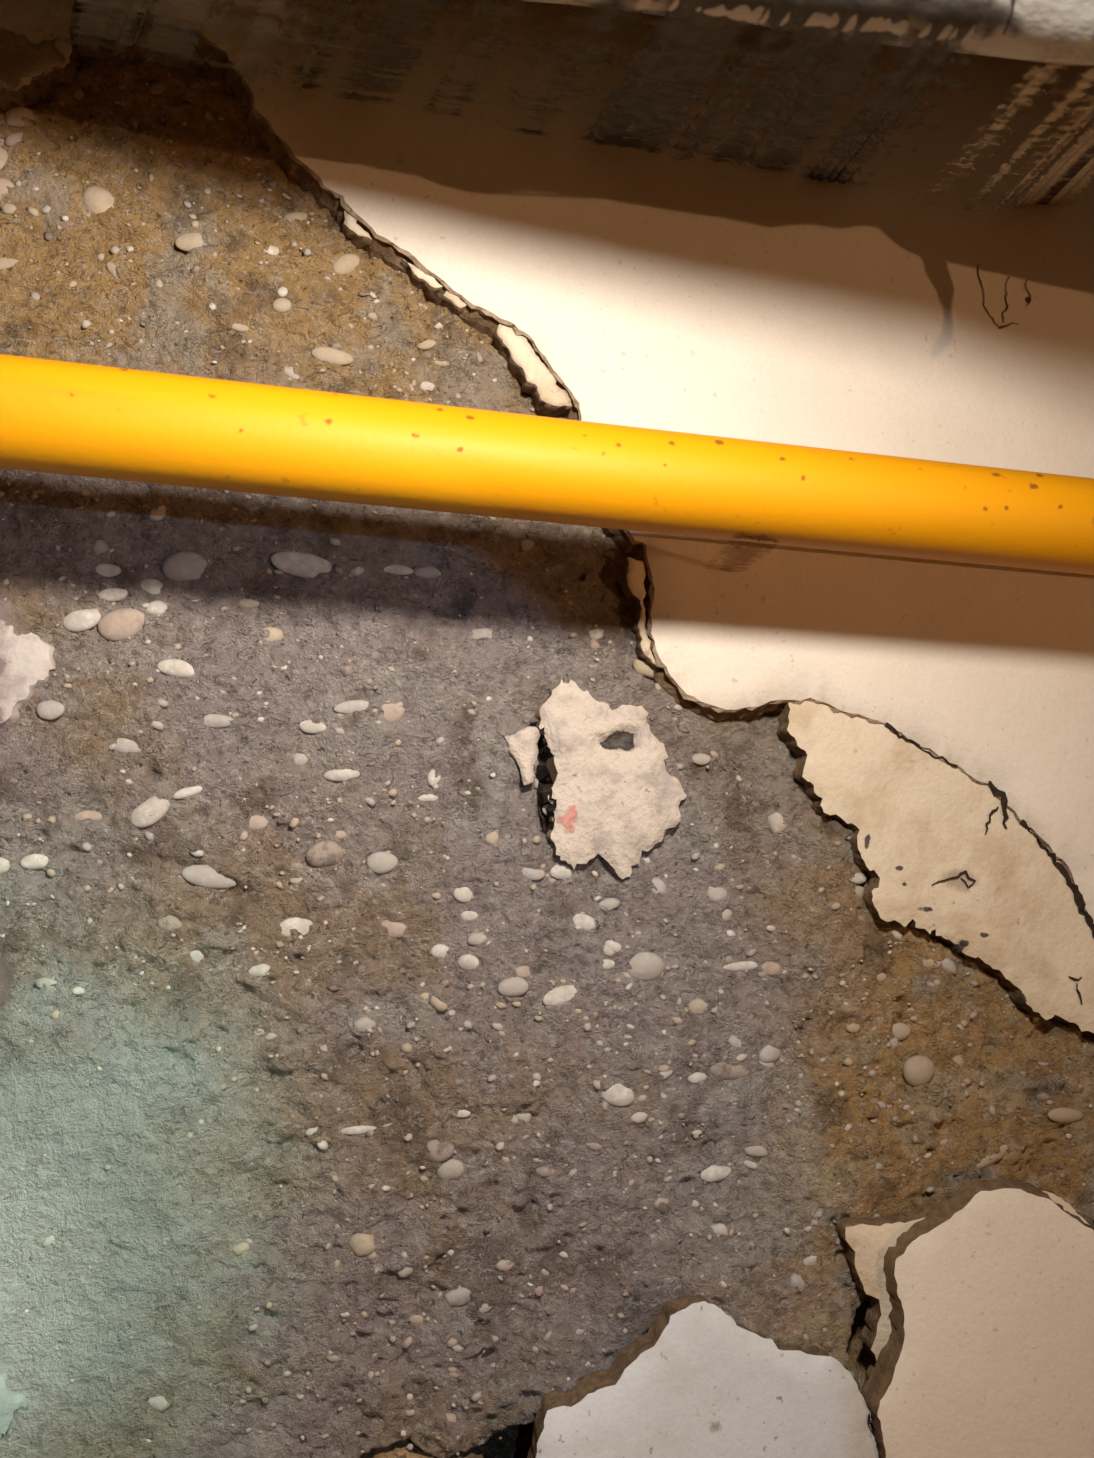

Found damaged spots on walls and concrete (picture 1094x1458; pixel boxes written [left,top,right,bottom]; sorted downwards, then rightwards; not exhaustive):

spalling [0,3,572,419]
water stain [48,0,1019,184]
peeling [954,36,1094,210]
crack [885,722,1094,937]
spalling [0,468,1094,1458]
crack [1068,976,1082,1004]
crack [868,1411,880,1457]